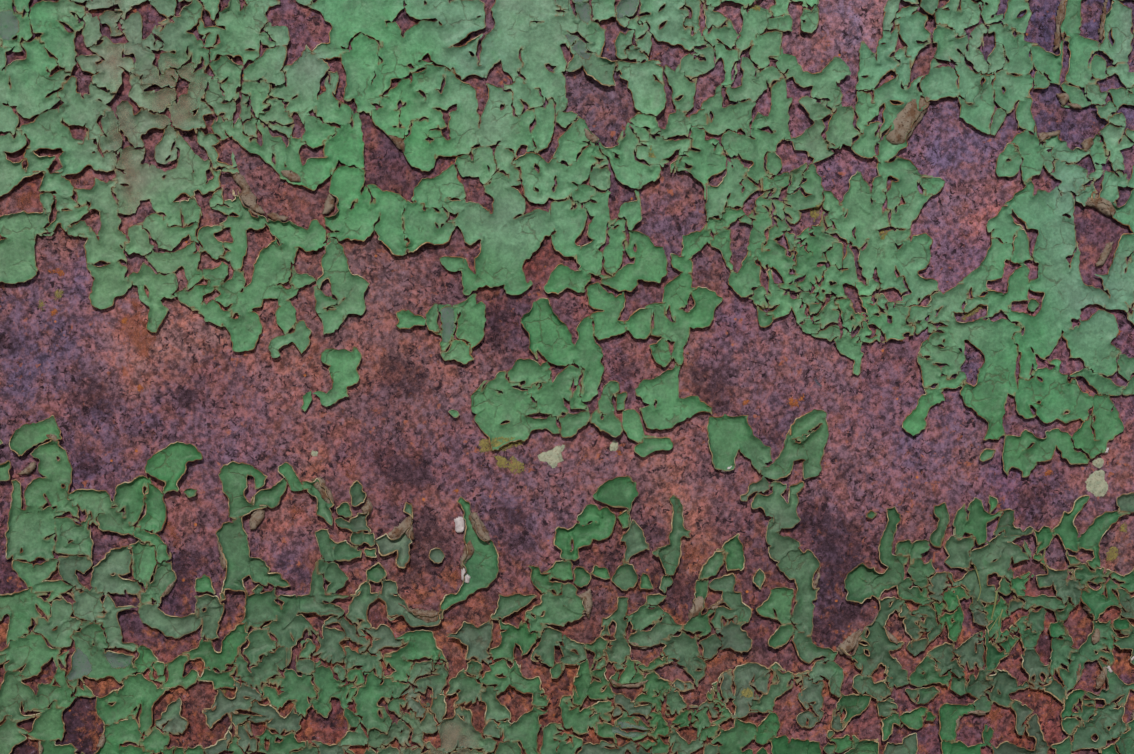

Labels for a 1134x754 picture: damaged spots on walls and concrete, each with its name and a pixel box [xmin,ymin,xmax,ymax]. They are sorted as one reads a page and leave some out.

rust [0,106,116,216]
rust [80,209,101,234]
rust [118,112,337,287]
rust [524,196,556,214]
rust [537,121,572,163]
peeling [0,0,1134,478]
rust [575,214,593,246]
rust [600,150,707,321]
rust [0,220,1134,754]
peeling [0,409,1134,754]